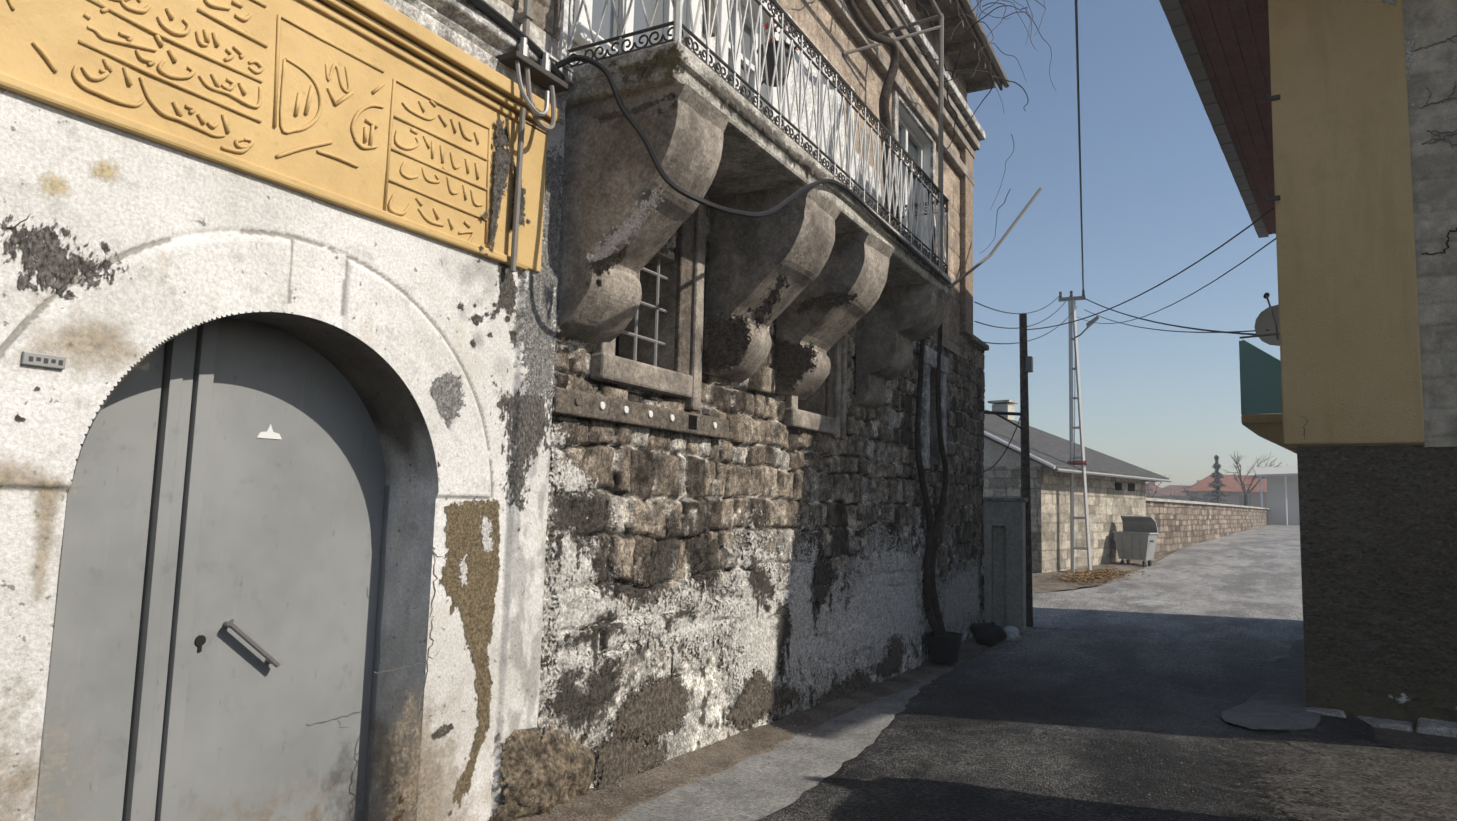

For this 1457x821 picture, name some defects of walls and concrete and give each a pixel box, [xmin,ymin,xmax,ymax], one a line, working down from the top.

crack [1413,35,1457,52]
crack [1419,81,1457,146]
peeling [0,214,129,300]
crack [1421,228,1457,278]
flaking render [430,372,467,430]
flaking render [439,117,572,816]
leakage [547,482,722,736]
leakage [741,553,794,713]
leakage [810,548,837,636]
flaking render [432,723,454,740]